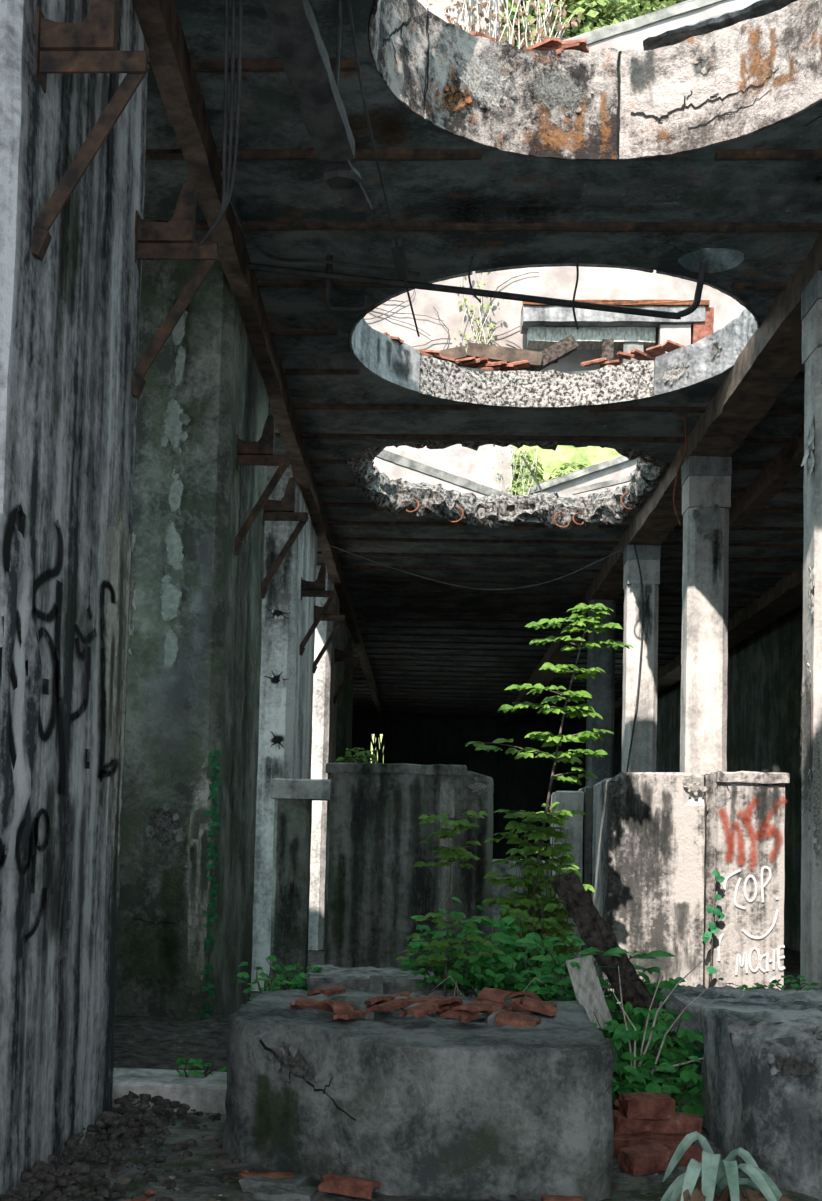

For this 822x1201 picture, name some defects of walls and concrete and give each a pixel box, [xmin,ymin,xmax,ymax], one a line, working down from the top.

corrosion [527,92,611,151]
crack [617,51,779,154]
corrosion [739,27,794,96]
spalling [656,361,689,385]
spalling [710,342,722,359]
flaking render [160,311,191,668]
spalling [347,440,667,530]
damp [614,771,696,982]